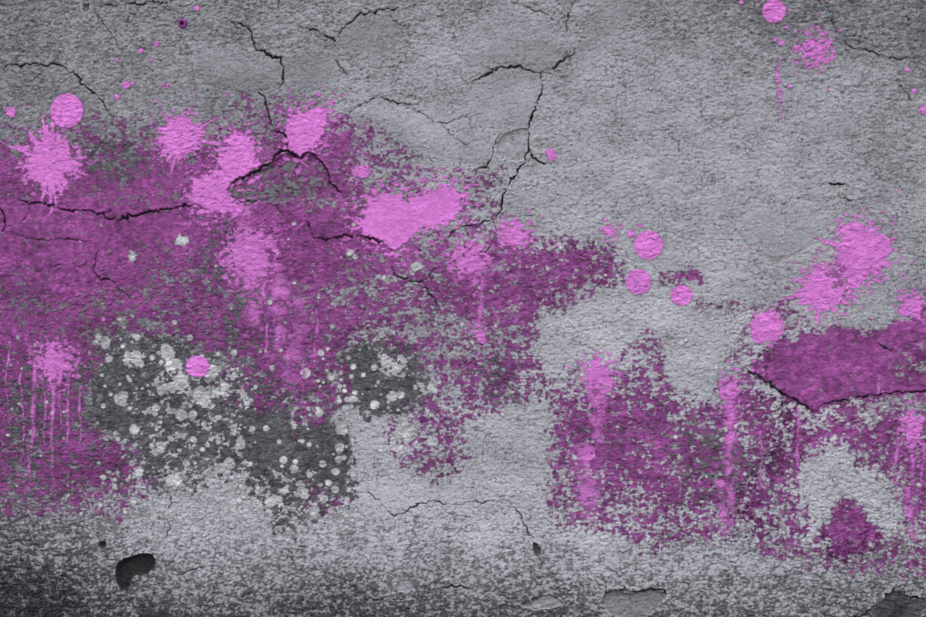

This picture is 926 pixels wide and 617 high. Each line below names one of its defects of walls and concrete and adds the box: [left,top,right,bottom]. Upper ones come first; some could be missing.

crack [239,23,284,83]
crack [12,57,107,110]
crack [228,93,342,207]
crack [450,52,575,253]
crack [0,201,191,227]
crack [309,225,384,243]
peeling [0,93,926,581]
crack [748,370,926,412]
spalling [114,552,157,592]
spalling [394,577,415,595]
spalling [522,593,565,613]
spalling [870,588,926,617]